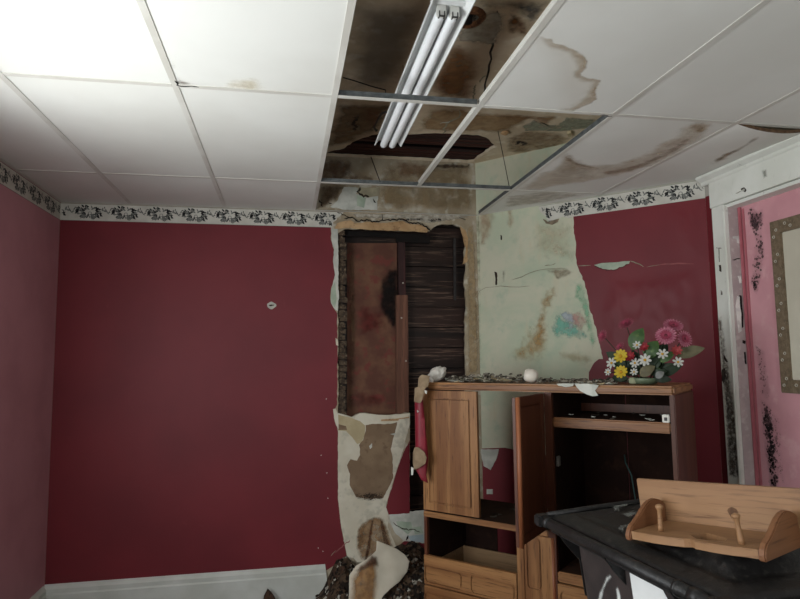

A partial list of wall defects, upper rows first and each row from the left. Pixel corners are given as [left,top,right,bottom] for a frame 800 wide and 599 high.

leakage [512,4,540,19]
peeling [460,13,502,44]
crack [442,11,498,133]
peeling [319,187,379,210]
crack [337,212,430,230]
leakage [720,335,738,476]
mould [762,404,780,487]
spalling [389,510,424,543]